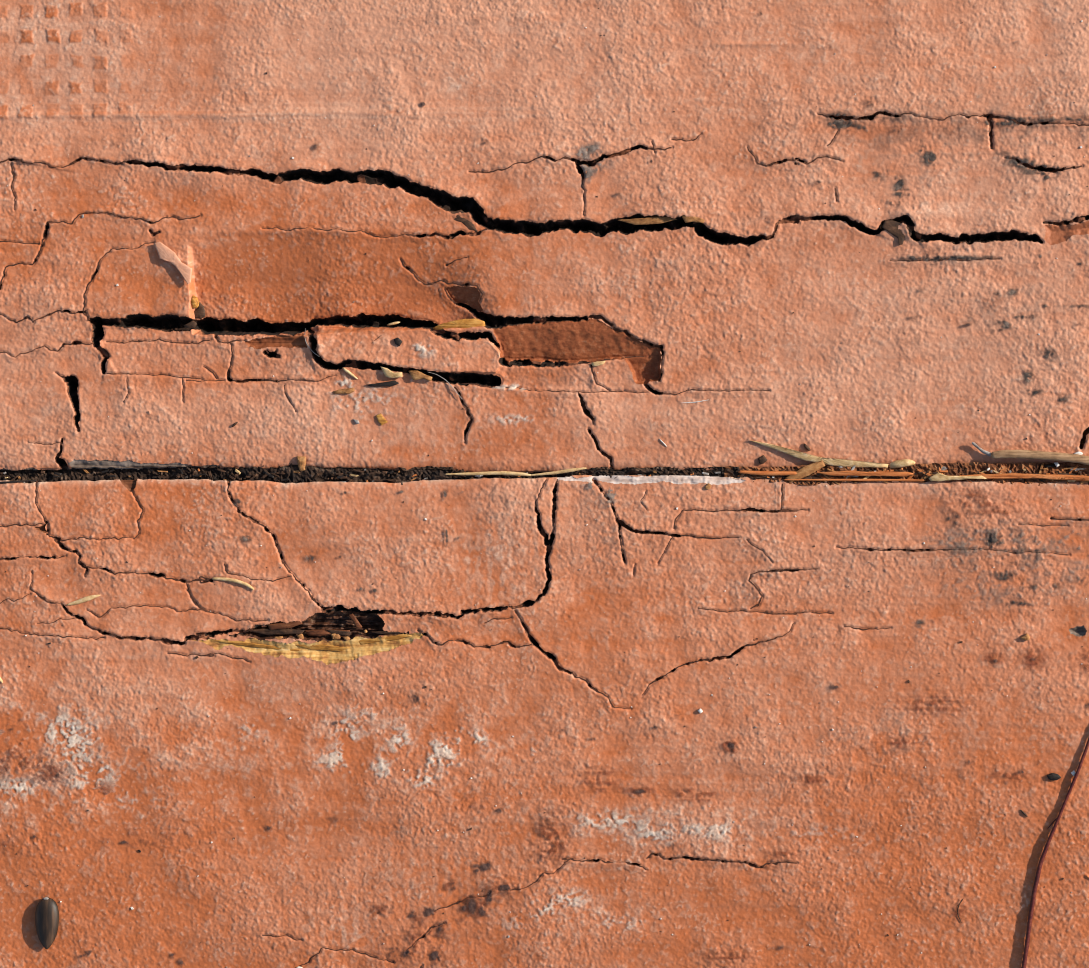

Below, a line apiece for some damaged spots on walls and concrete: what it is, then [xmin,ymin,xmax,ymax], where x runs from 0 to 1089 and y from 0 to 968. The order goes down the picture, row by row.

crack [747,111,1085,173]
peeling [183,302,205,328]
peeling [446,286,483,312]
peeling [493,319,662,384]
crack [0,134,1089,709]
spalling [229,608,409,642]
crack [262,853,797,968]